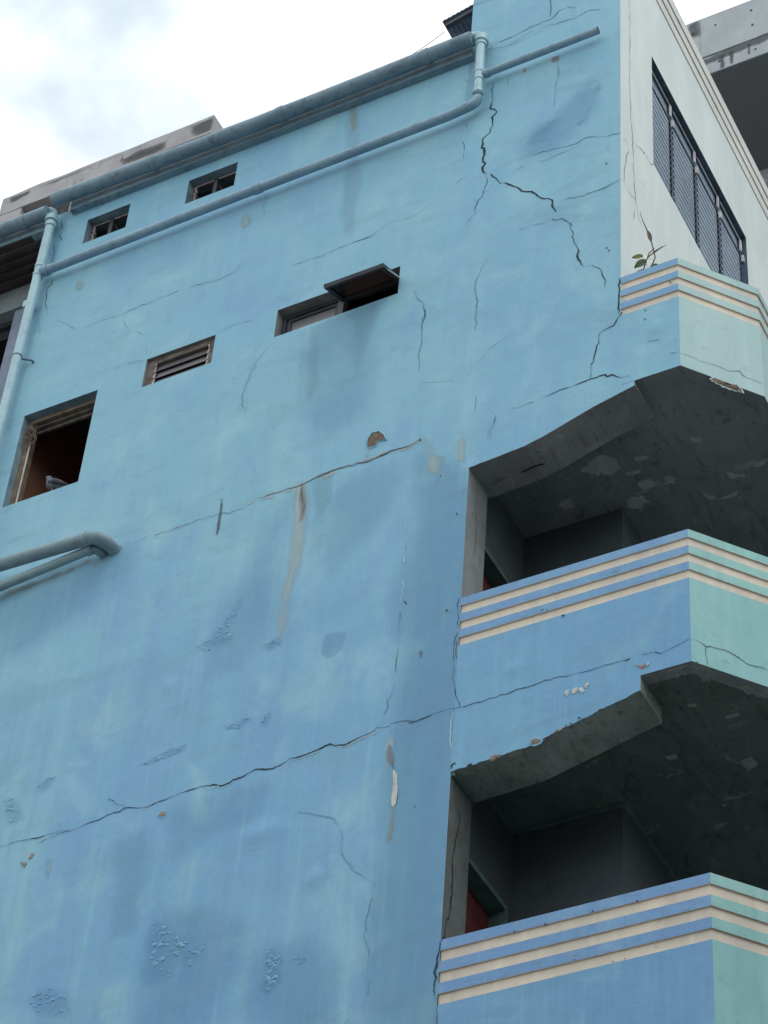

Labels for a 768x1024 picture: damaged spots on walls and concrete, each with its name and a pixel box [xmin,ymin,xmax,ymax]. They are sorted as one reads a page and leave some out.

crack [456,43,652,408]
crack [137,290,426,542]
spalling [366,431,388,455]
spalling [710,377,744,393]
water stain [280,485,306,633]
crack [1,598,767,846]
crack [299,812,375,955]